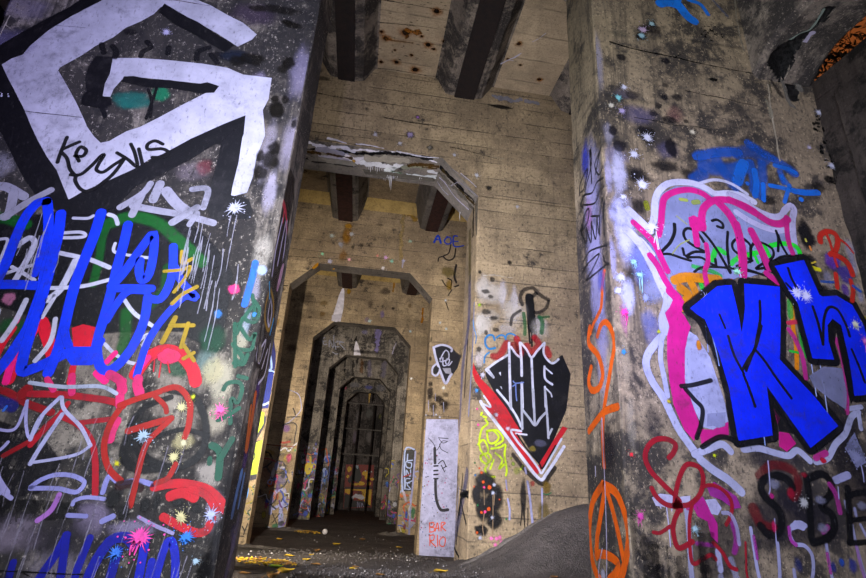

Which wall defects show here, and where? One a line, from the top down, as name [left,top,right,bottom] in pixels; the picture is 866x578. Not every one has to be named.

rust [379,28,444,64]